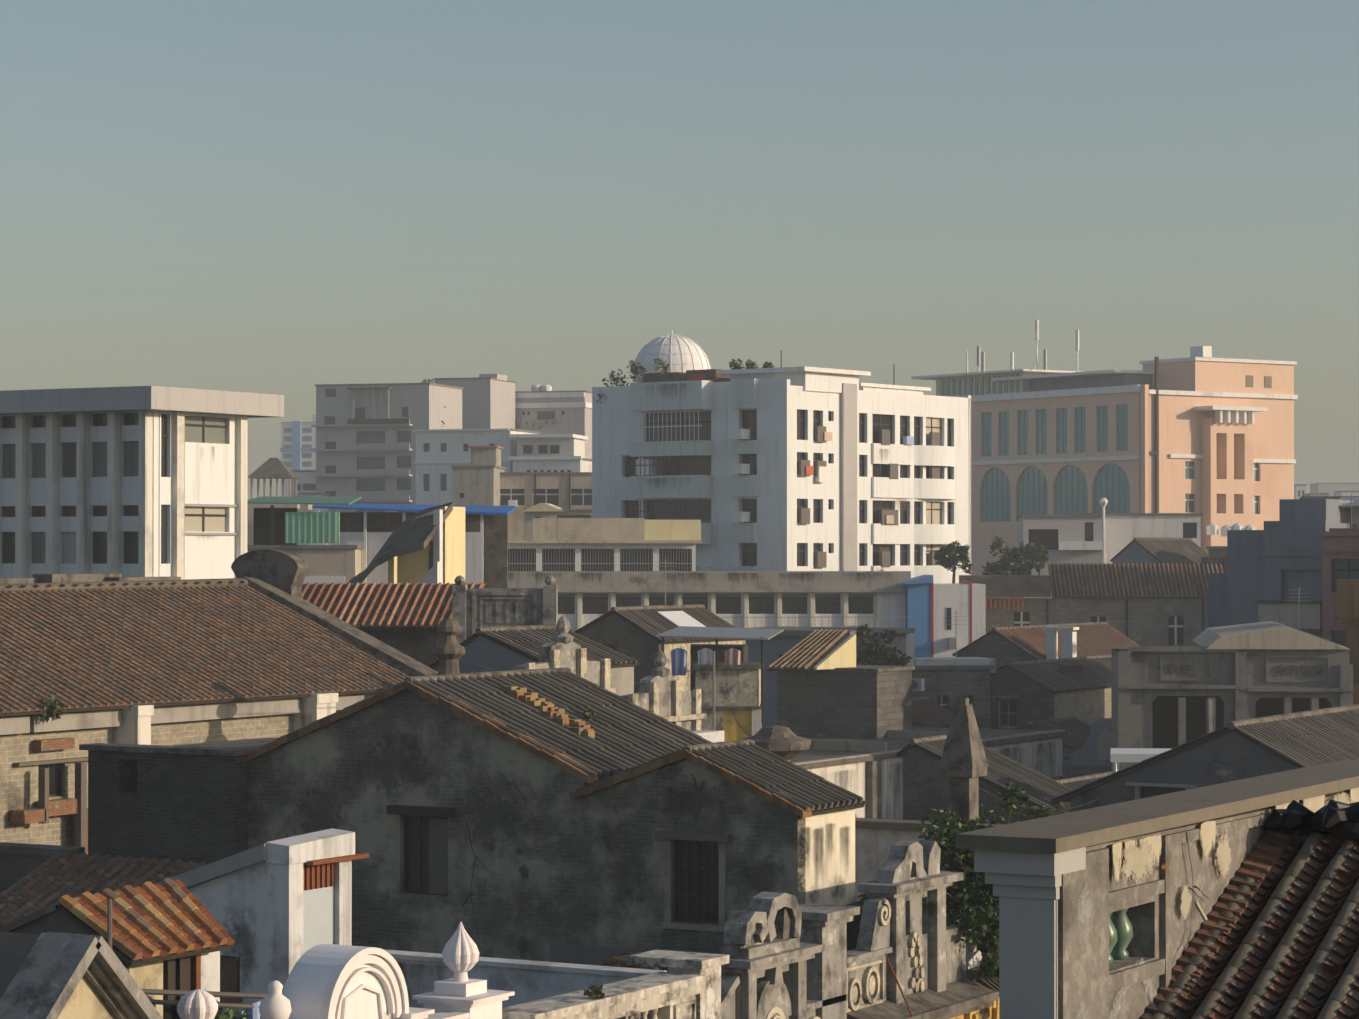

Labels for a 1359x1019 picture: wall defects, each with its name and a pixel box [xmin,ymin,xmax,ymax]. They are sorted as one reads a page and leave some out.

peeling [1112,835,1162,885]
peeling [1200,821,1232,877]
peeling [1180,885,1192,920]